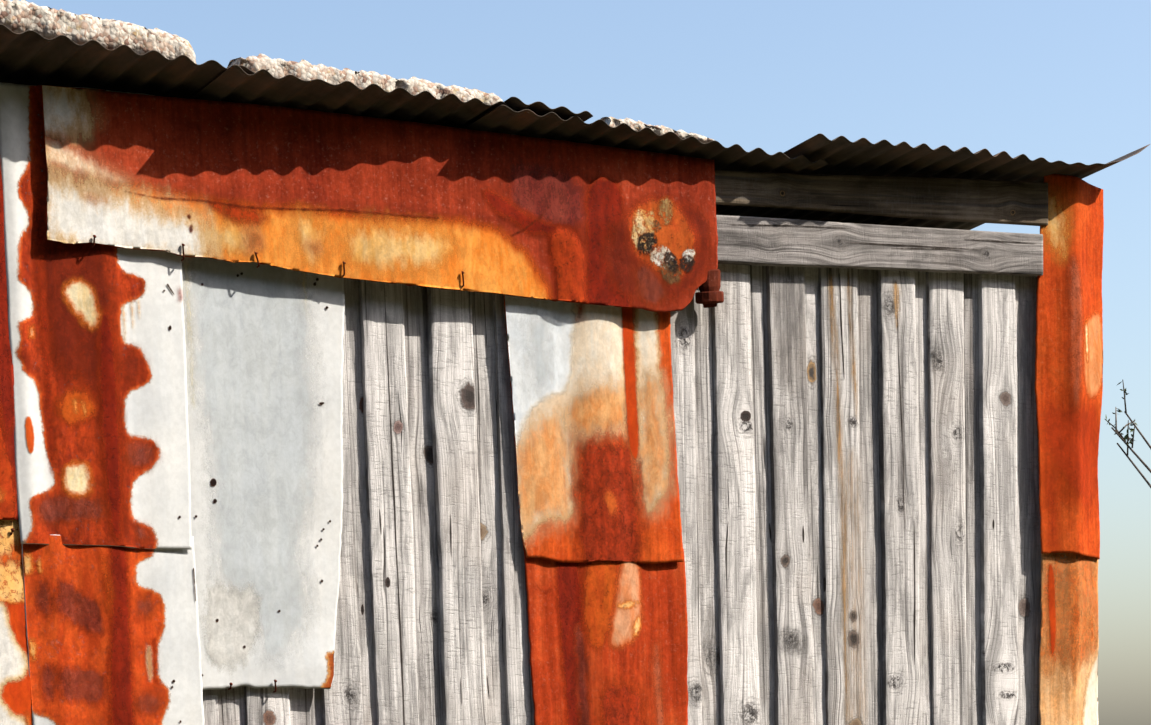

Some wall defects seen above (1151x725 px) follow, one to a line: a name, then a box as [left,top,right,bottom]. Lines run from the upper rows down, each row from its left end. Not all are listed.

rust [0,85,170,725]
rust [321,651,335,689]
rust [110,184,553,300]
rust [506,156,710,725]
rust [1040,256,1100,680]